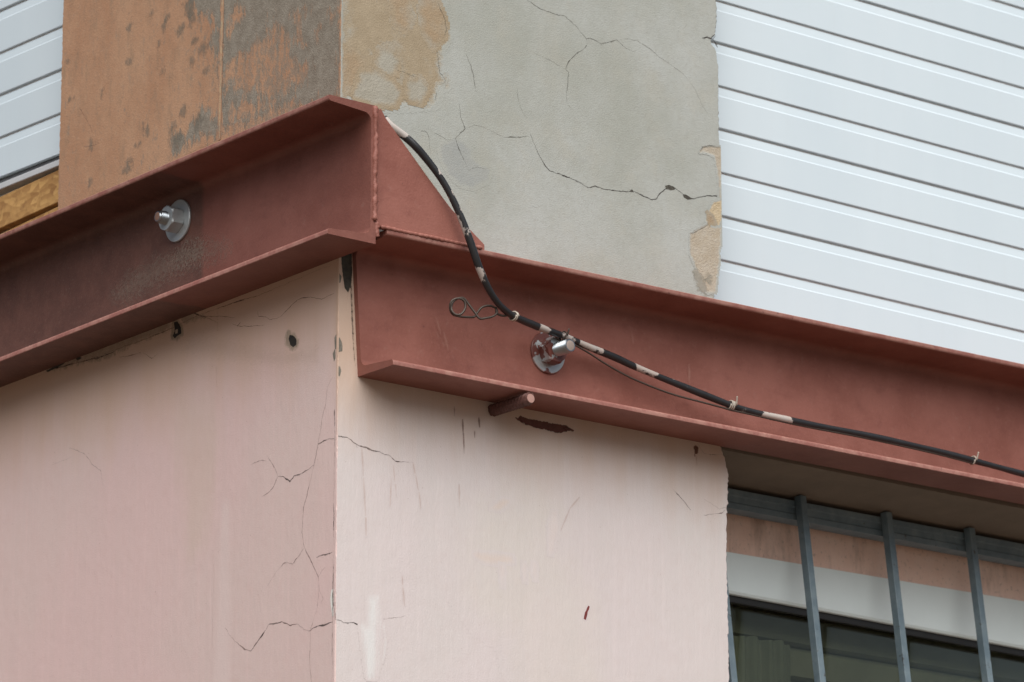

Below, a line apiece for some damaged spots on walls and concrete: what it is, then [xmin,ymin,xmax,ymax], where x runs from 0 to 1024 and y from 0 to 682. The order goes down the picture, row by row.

peeling [164,0,454,163]
crack [510,134,717,200]
flaking render [688,143,722,295]
crack [257,410,399,495]
crack [226,602,358,650]